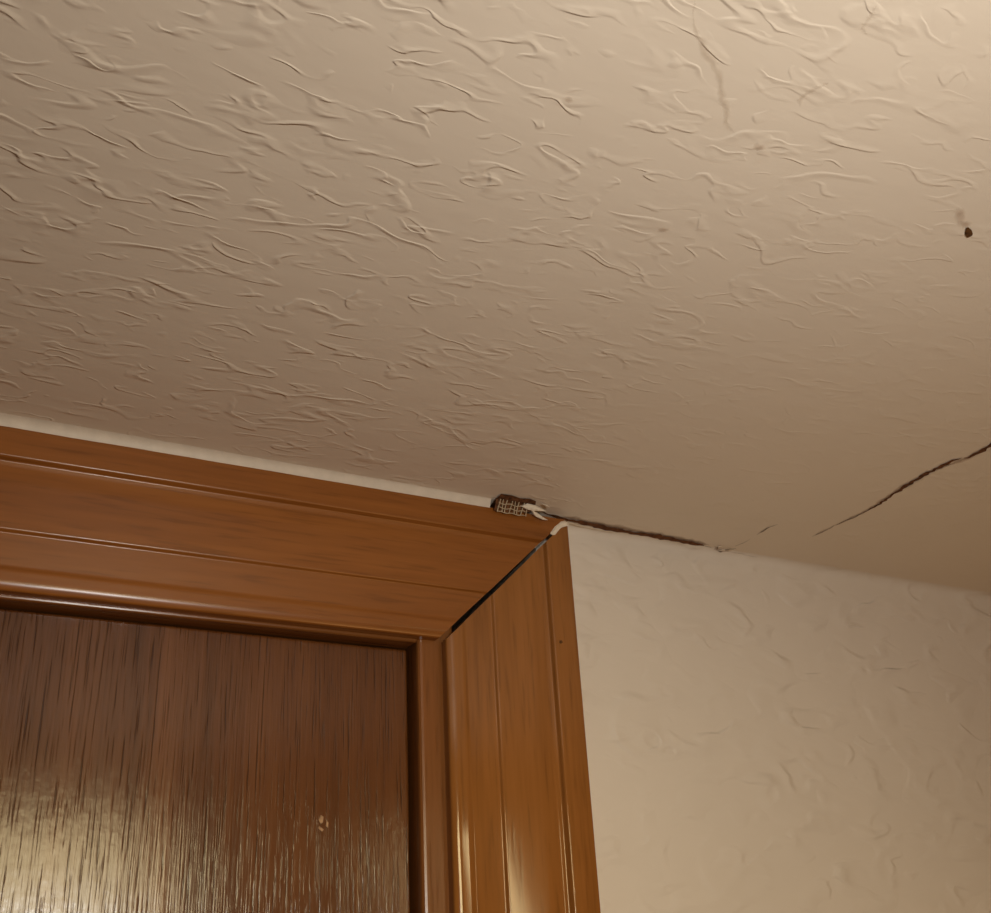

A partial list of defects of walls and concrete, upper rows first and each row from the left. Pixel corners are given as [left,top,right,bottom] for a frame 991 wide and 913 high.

spalling [494,494,550,520]
crack [819,443,991,534]
crack [542,511,711,548]